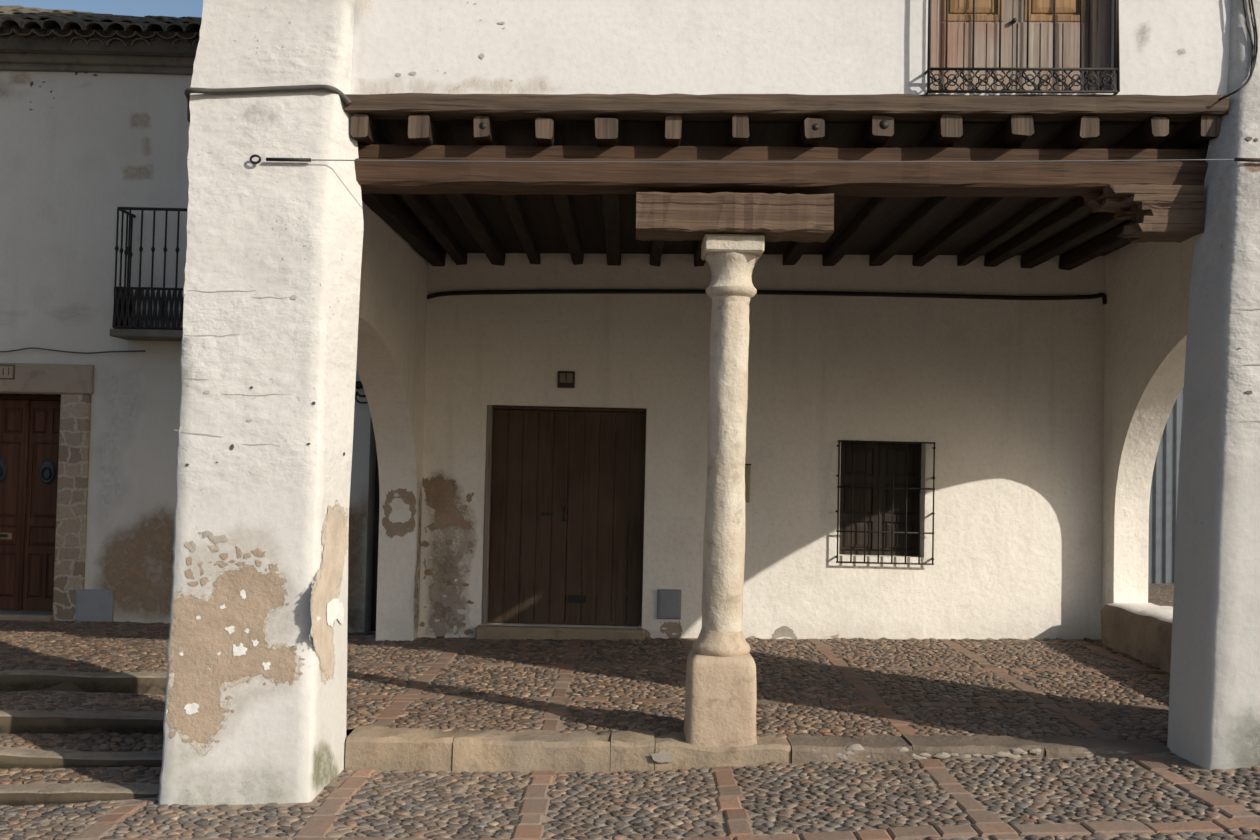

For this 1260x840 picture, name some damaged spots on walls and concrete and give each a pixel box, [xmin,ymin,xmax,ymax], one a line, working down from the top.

damp [101,516,174,614]
flaking render [165,499,348,756]
flaking render [382,474,474,638]